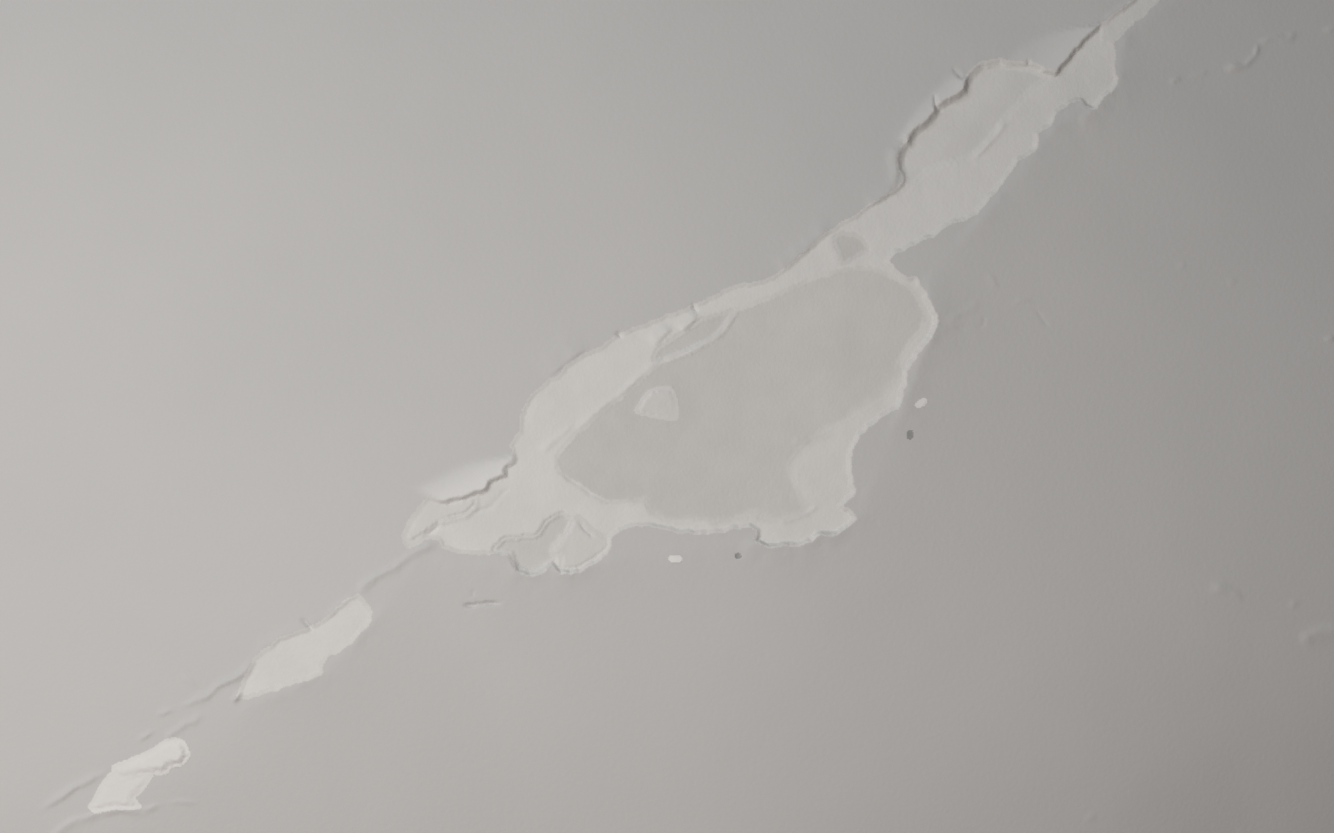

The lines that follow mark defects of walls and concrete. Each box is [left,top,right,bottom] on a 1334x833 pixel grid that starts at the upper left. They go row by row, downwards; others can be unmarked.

peeling [383,0,1188,599]
peeling [225,582,390,714]
peeling [87,737,190,814]